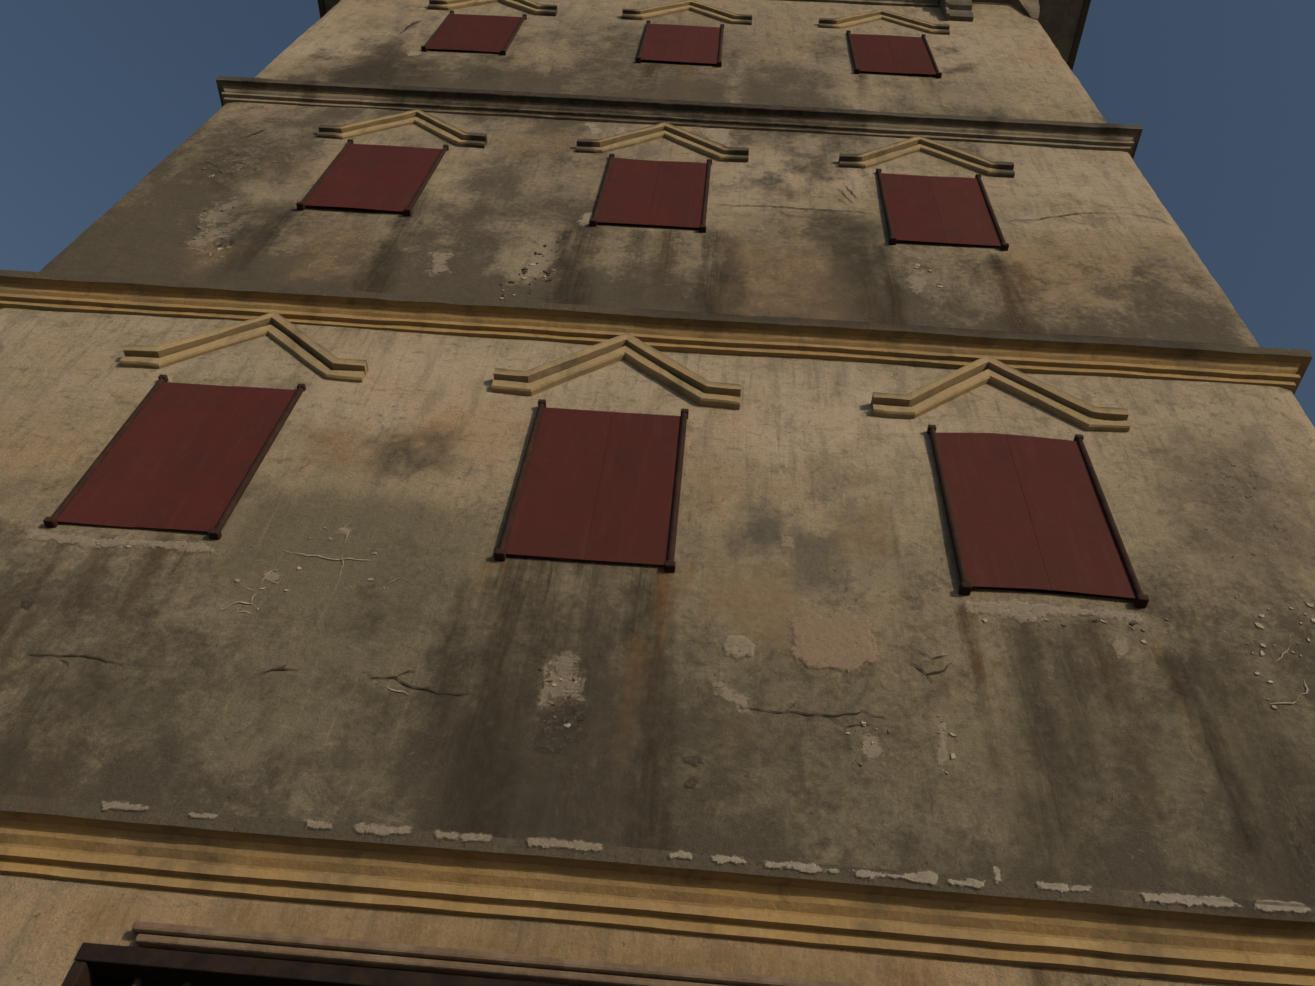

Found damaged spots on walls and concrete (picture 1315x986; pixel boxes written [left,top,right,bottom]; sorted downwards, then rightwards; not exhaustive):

damp [341,48,842,144]
damp [448,559,525,836]
spalling [535,650,587,754]
peeling [102,801,149,810]
peeling [356,822,411,835]
peeling [435,830,492,842]
peeling [528,837,602,851]
peeling [669,850,692,859]
peeling [712,854,747,864]
peeling [766,861,1002,888]
peeling [1037,881,1091,892]
peeling [1141,892,1310,913]